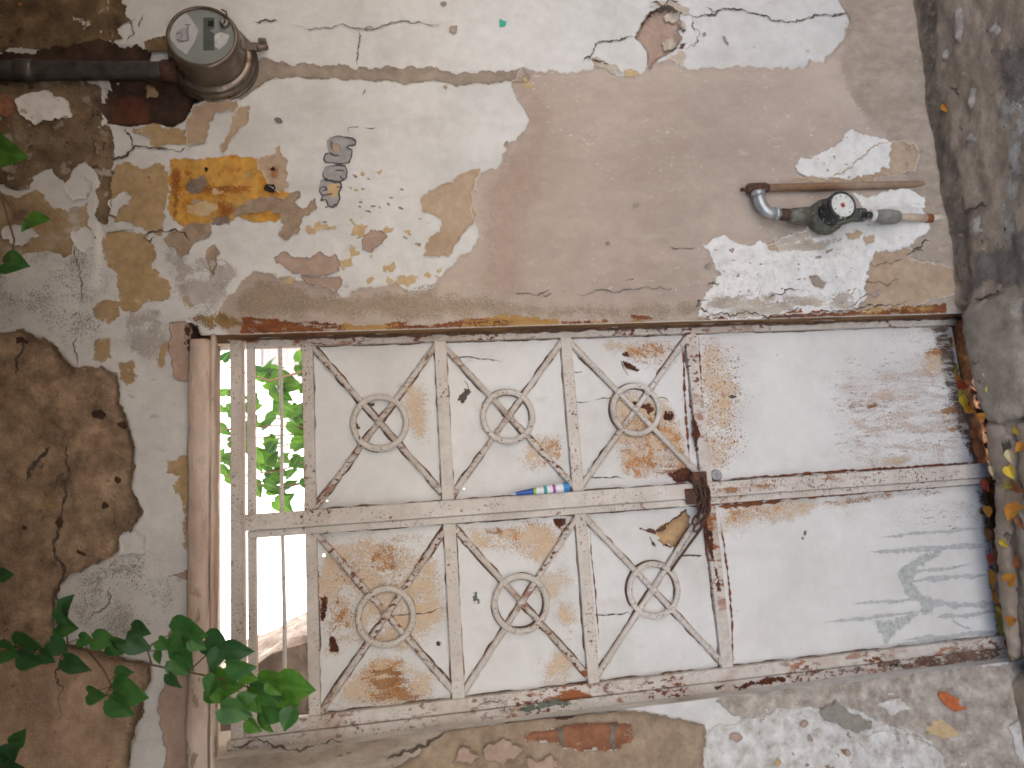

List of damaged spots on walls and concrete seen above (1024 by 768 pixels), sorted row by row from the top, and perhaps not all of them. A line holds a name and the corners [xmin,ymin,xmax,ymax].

crack [254,19,446,94]
crack [650,0,847,49]
flaking render [0,80,251,191]
peeling [213,0,964,334]
corrosion [187,311,661,334]
crack [26,429,71,601]
flaking render [0,328,144,654]
corrosion [573,303,980,659]
corrosion [318,529,448,710]
crack [55,657,64,720]
flaking render [0,645,188,768]
flaking render [393,699,707,768]